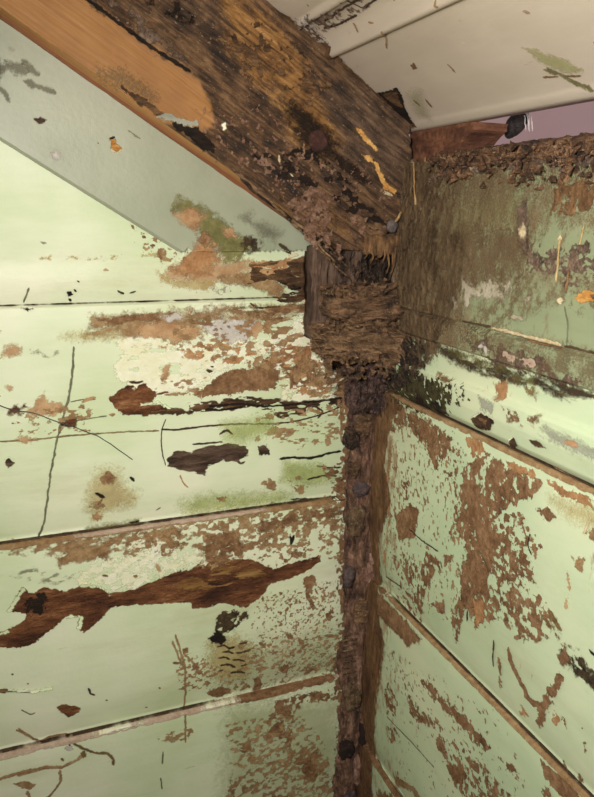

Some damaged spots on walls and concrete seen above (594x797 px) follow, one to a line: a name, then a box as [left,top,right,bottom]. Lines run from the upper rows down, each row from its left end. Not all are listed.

water stain [430,229,594,386]
peeling [109,381,171,416]
crack [0,346,345,536]
peeling [167,441,248,488]
peeling [0,555,321,648]
peeling [0,683,53,694]
peeling [57,704,81,717]